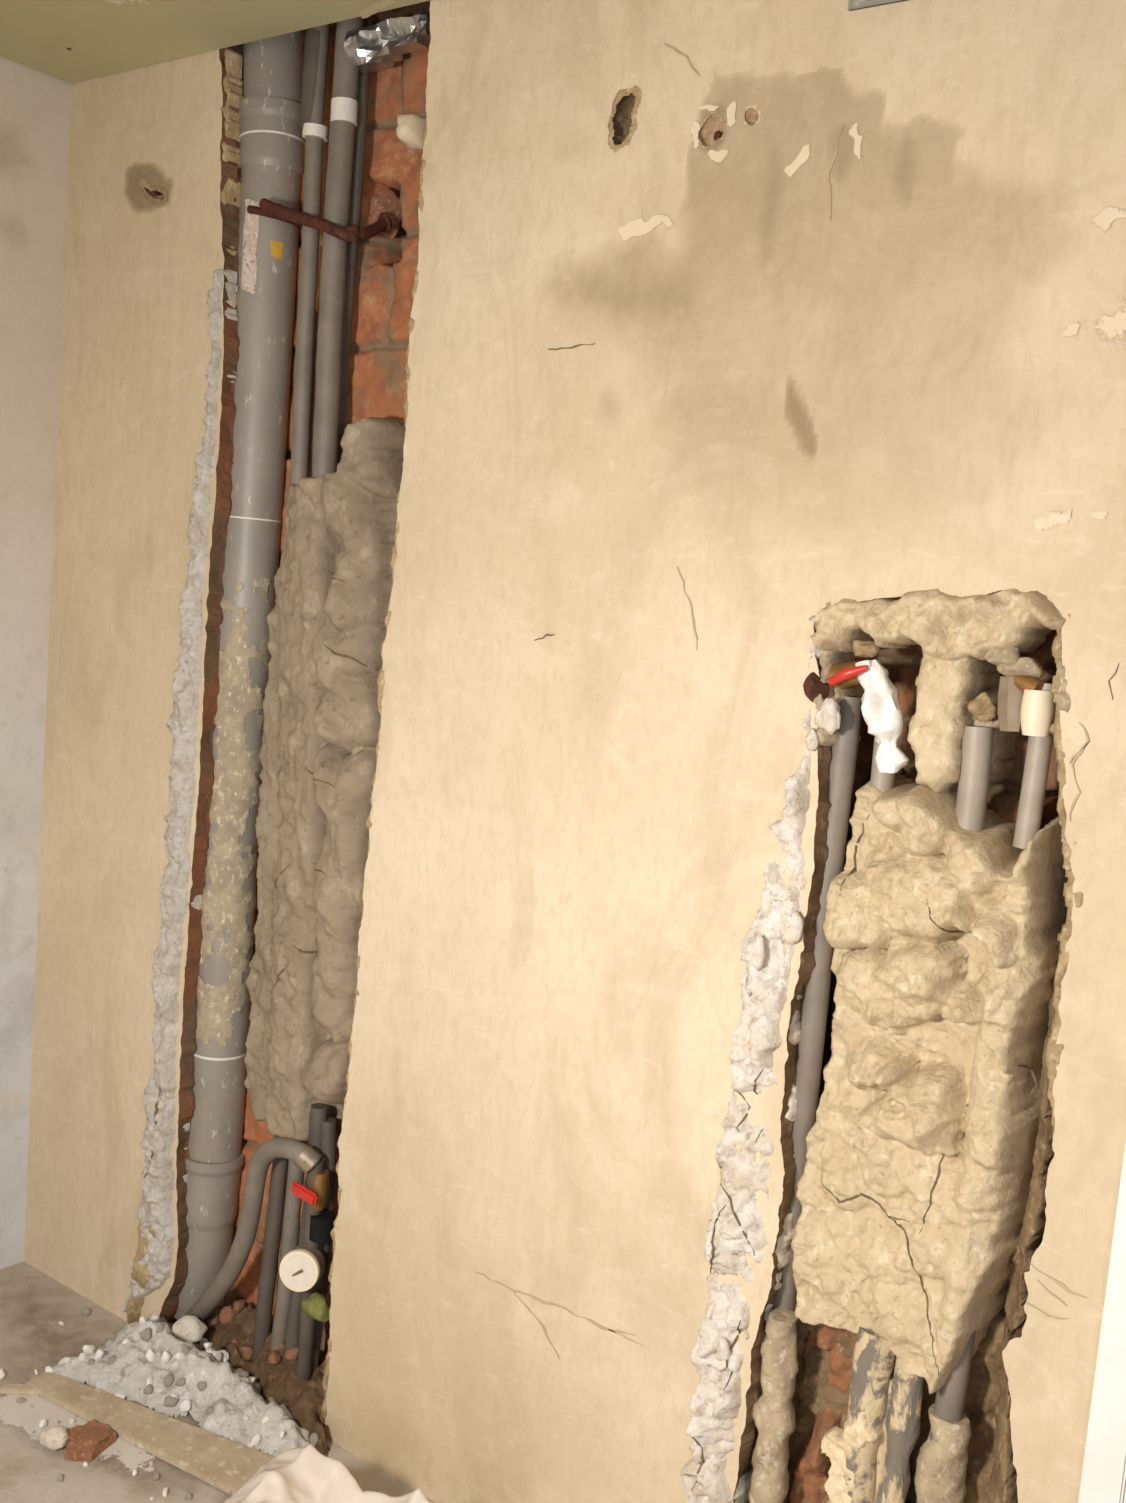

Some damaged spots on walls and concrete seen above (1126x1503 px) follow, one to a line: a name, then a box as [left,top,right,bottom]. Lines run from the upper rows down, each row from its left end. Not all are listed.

spalling [607,85,642,152]
spalling [690,101,759,162]
peeling [1062,294,1126,351]
crack [475,1272,642,1359]